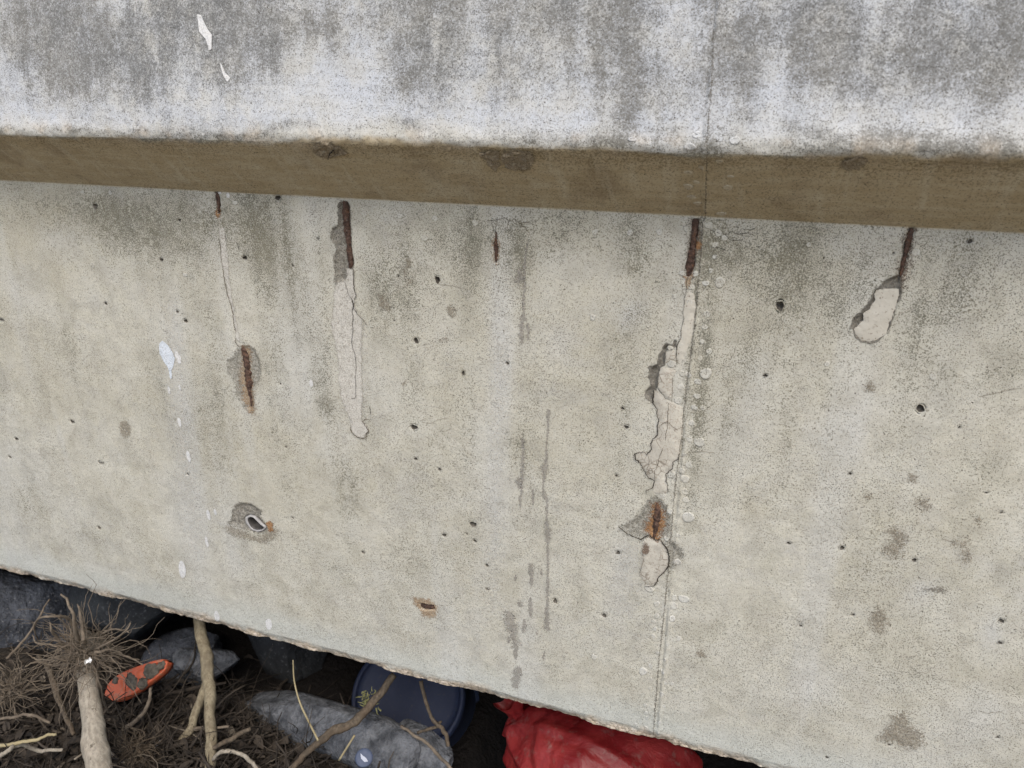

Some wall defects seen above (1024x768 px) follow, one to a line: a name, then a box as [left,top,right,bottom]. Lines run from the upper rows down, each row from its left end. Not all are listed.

crack [218,227,240,346]
spalling [330,200,371,439]
corrosion [492,232,501,265]
corrosion [683,218,702,290]
spalling [850,227,917,344]
spalling [620,340,686,587]
spalling [225,525,282,544]
corrosion [410,596,439,618]